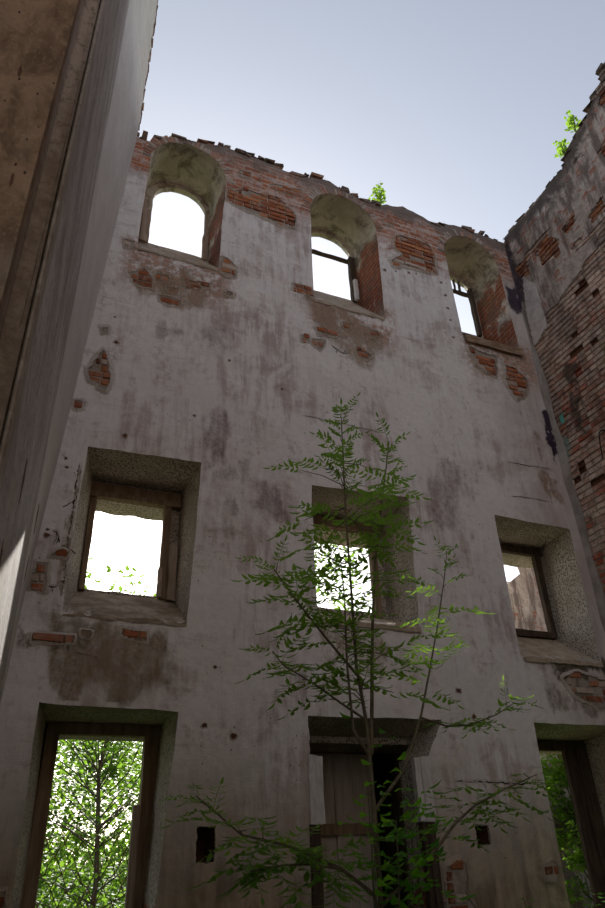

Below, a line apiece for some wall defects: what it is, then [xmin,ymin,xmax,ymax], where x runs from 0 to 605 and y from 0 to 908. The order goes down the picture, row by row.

spalling [128,267,212,309]
spalling [218,255,239,299]
spalling [83,316,120,395]
spalling [299,321,353,352]
spalling [464,345,529,402]
spalling [26,546,69,594]
spalling [27,630,78,647]
damp [49,613,166,702]
spalling [559,669,605,712]